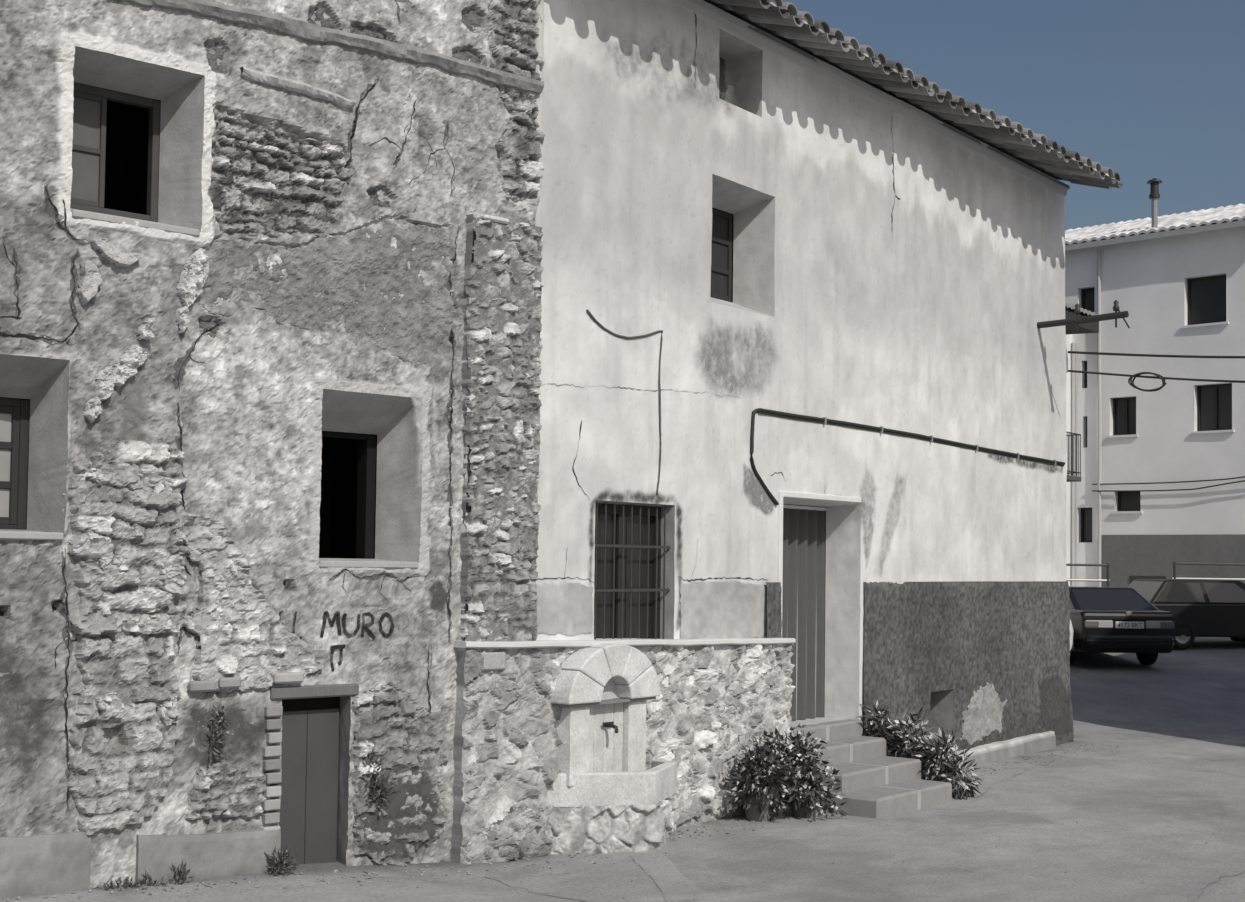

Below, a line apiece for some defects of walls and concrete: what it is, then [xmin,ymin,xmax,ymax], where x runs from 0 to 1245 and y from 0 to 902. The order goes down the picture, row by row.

crack [344,78,455,197]
crack [0,184,88,346]
peeling [76,238,141,305]
peeling [196,105,456,367]
leakage [702,330,770,392]
crack [329,226,460,714]
flaking render [73,465,324,693]
crack [55,548,81,815]
flaking render [95,692,125,711]
flaking render [156,696,181,726]
flaking render [181,759,271,824]
flaking render [347,684,449,867]